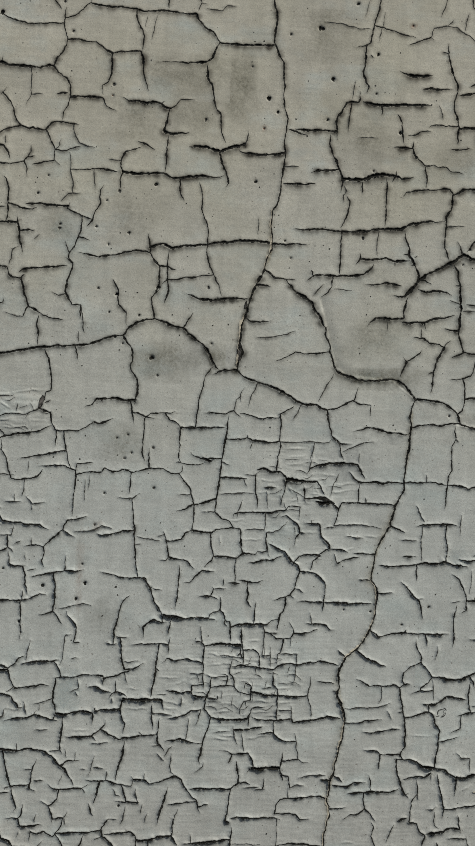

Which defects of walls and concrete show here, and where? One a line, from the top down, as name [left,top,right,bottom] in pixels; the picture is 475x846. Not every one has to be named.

crack [0,0,286,165]
crack [111,97,218,199]
crack [290,82,432,200]
crack [330,0,475,92]
crack [0,168,118,336]
crack [295,143,475,391]
crack [0,400,136,514]
crack [0,515,86,637]
crack [98,495,337,687]
crack [0,595,170,753]
crack [0,718,264,846]
crack [344,643,475,846]